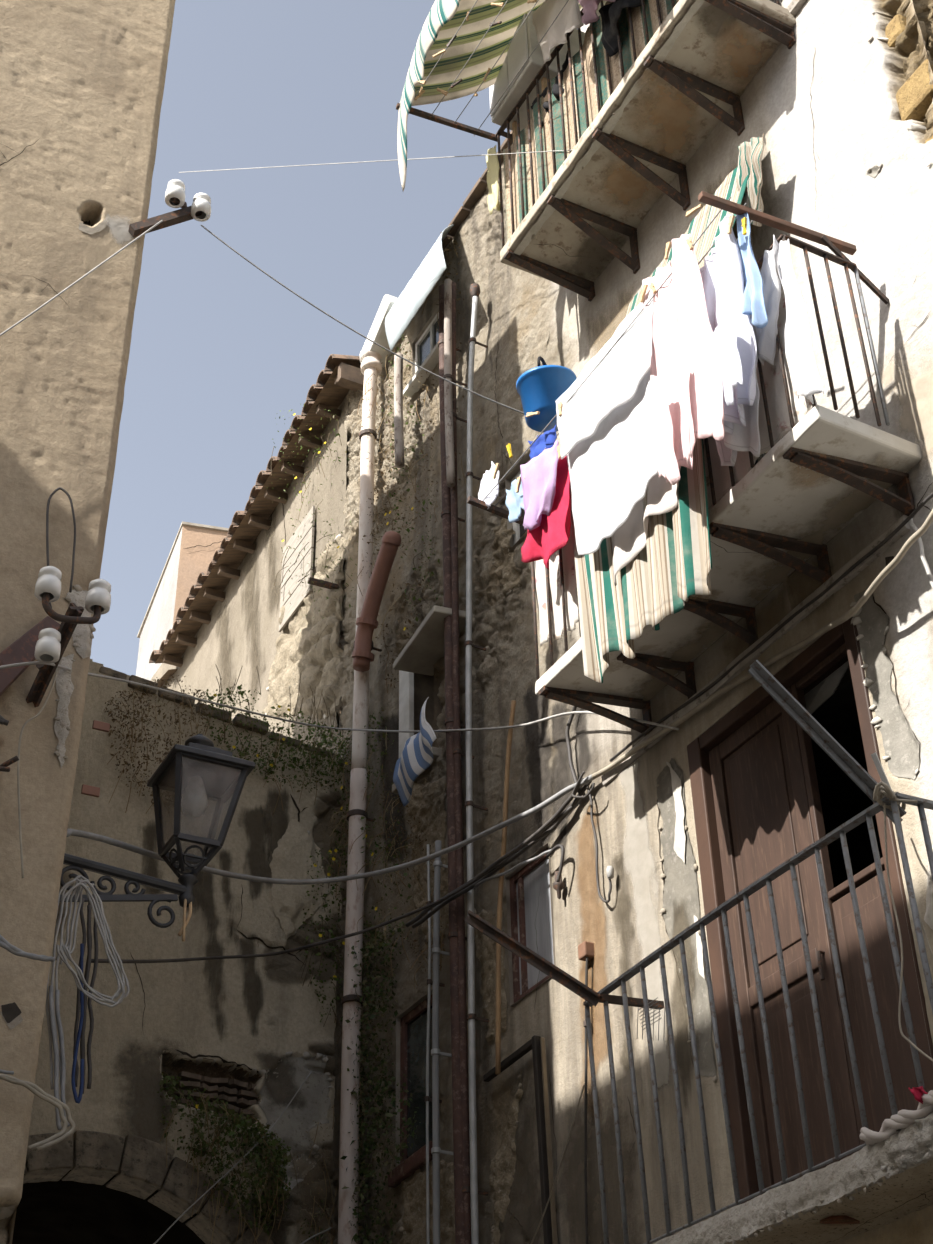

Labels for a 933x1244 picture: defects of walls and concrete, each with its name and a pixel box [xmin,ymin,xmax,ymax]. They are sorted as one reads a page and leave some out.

spalling [868,0,933,143]
spalling [867,162,882,178]
crack [873,596,920,758]
spalling [817,1215,860,1225]